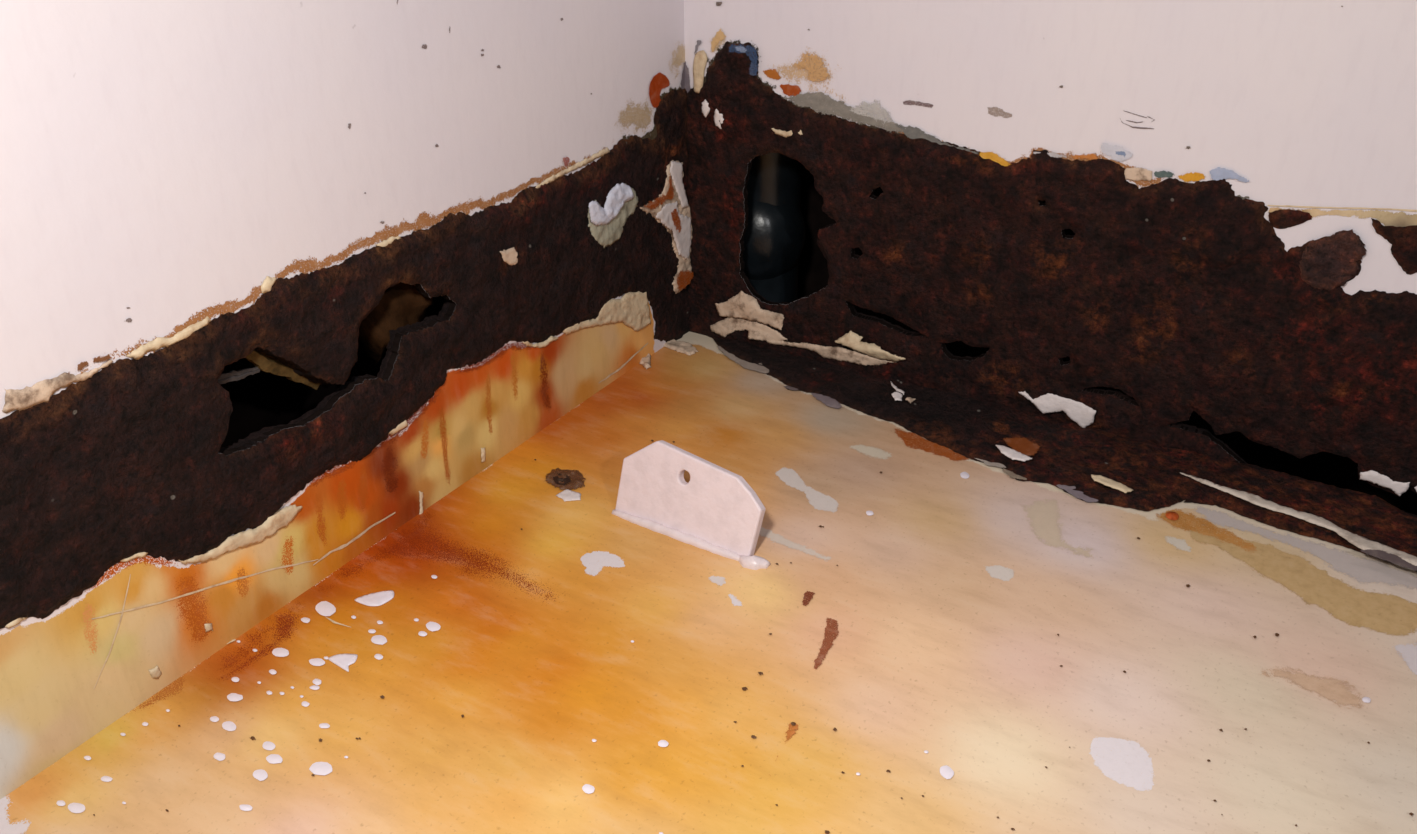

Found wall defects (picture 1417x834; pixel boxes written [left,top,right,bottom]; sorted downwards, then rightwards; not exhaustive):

rust [711,29,726,52]
rust [763,47,846,103]
rust [613,97,652,133]
peeling [701,99,724,129]
peeling [771,128,803,138]
peeling [655,161,692,259]
rust [671,208,682,231]
rust [1371,218,1417,275]
peeling [261,276,276,293]
rust [75,336,157,374]
peeling [389,420,408,436]
rust [1211,522,1417,604]